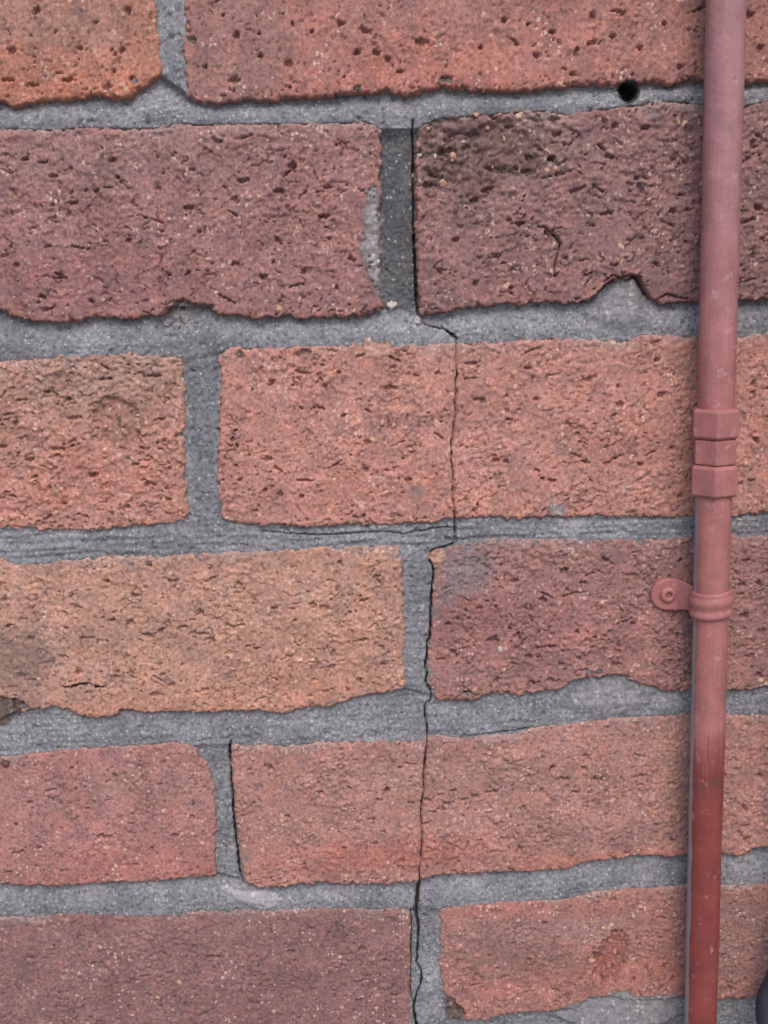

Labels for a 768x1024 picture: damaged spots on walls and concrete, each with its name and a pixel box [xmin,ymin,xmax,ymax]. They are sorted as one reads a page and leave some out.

crack [228,741,243,876]
crack [409,121,458,1024]